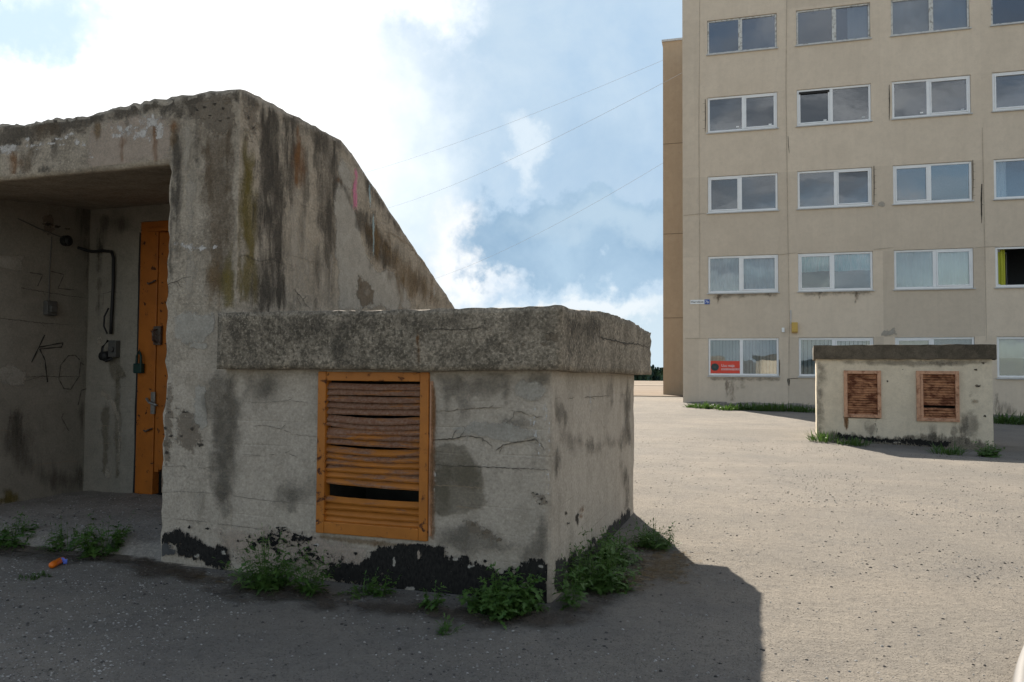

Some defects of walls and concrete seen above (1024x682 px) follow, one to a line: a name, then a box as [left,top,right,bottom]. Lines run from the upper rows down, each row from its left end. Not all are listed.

damp [0,92,345,311]
peeling [320,160,411,311]
damp [356,210,435,298]
crack [433,430,547,470]
peeling [162,508,630,603]